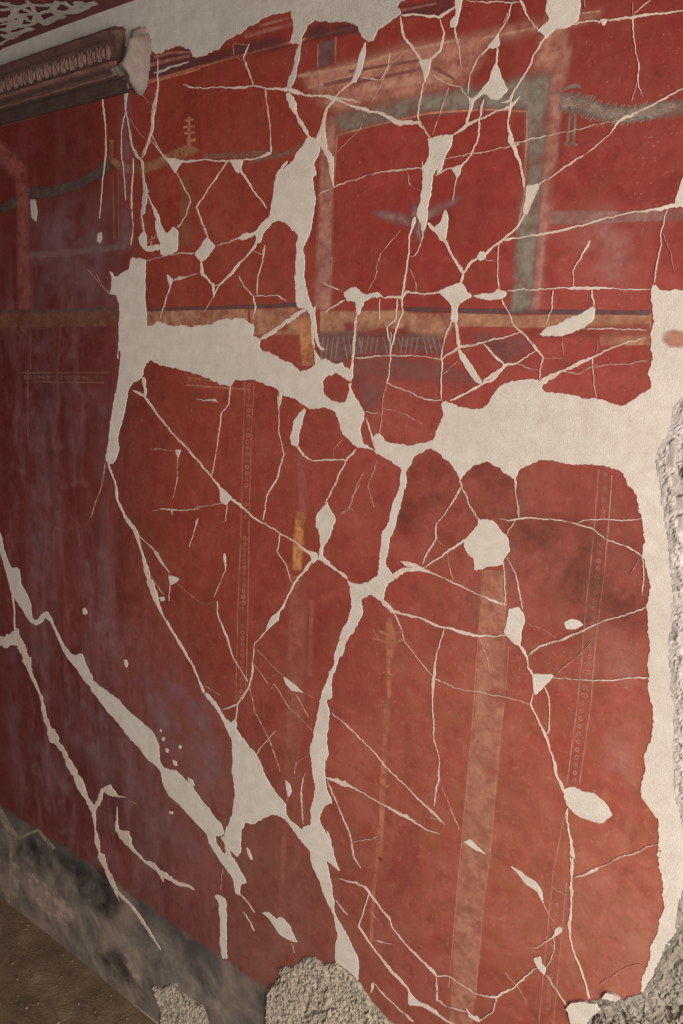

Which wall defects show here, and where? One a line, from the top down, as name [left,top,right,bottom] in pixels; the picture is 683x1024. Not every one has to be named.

crack [0,0,99,45]
crack [0,628,195,950]
spalling [0,0,404,245]
spalling [96,136,390,693]
crack [133,377,459,835]
spalling [0,285,683,999]
crack [138,0,683,434]
crack [336,878,567,1024]